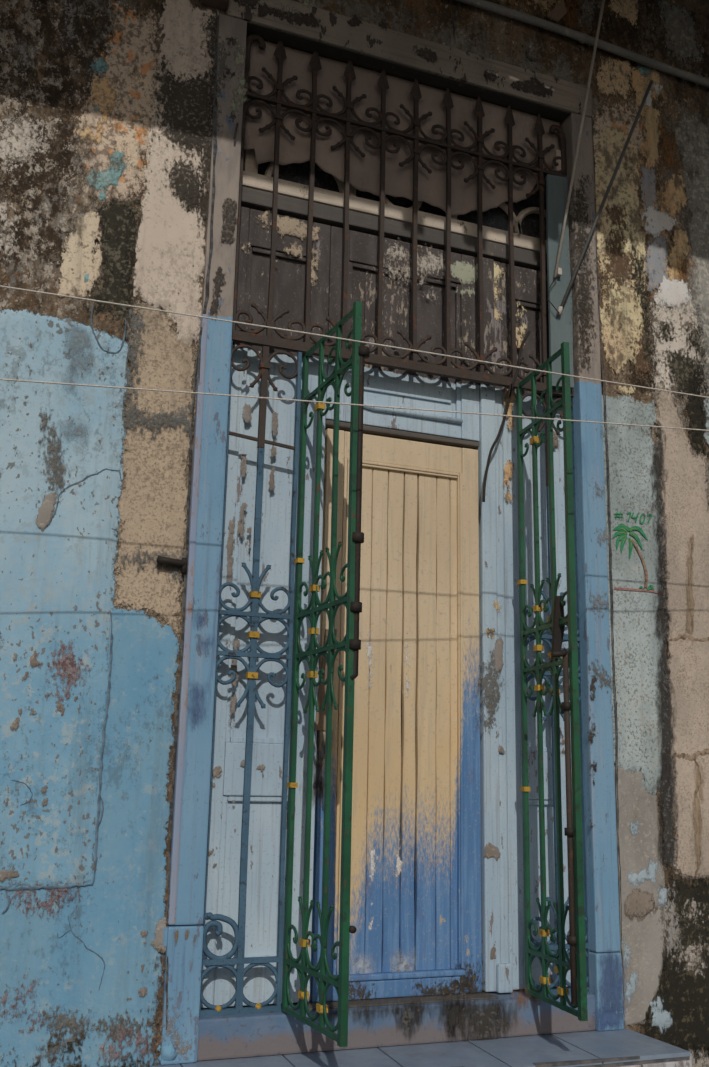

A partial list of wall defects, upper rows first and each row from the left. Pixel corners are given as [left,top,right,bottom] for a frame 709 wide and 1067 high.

peeling [0,114,47,171]
peeling [58,1,163,300]
peeling [0,195,18,260]
crack [37,468,121,527]
flaking render [568,56,709,1033]
peeling [476,628,505,753]
crack [0,612,113,914]
leakage [635,425,709,1059]
peeling [10,883,81,917]
crack [57,916,105,989]
peeling [102,998,192,1062]
leakage [354,998,511,1041]